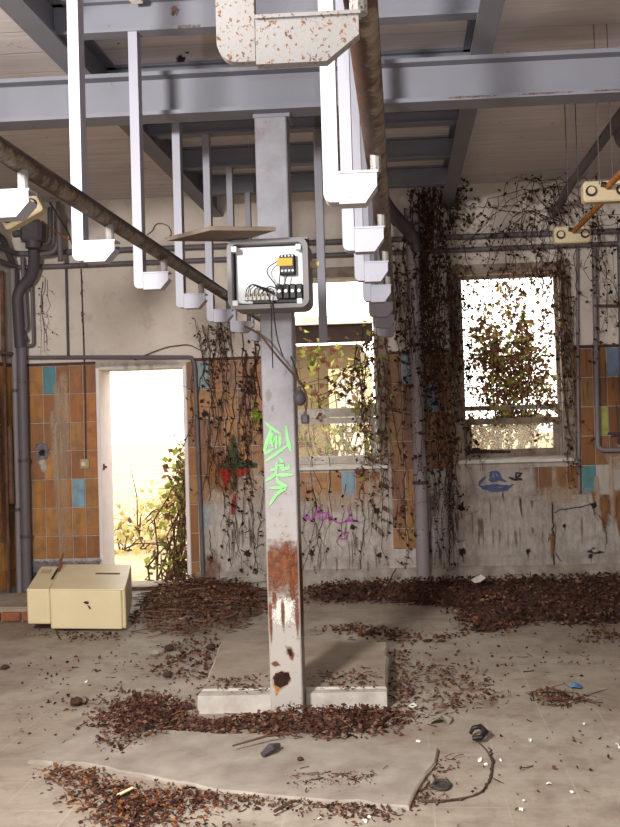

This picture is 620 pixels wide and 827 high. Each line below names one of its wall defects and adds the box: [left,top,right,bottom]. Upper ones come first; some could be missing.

peeling [458,466,573,561]
peeling [559,489,620,558]
corrosion [267,541,304,640]
corrosion [271,661,291,695]